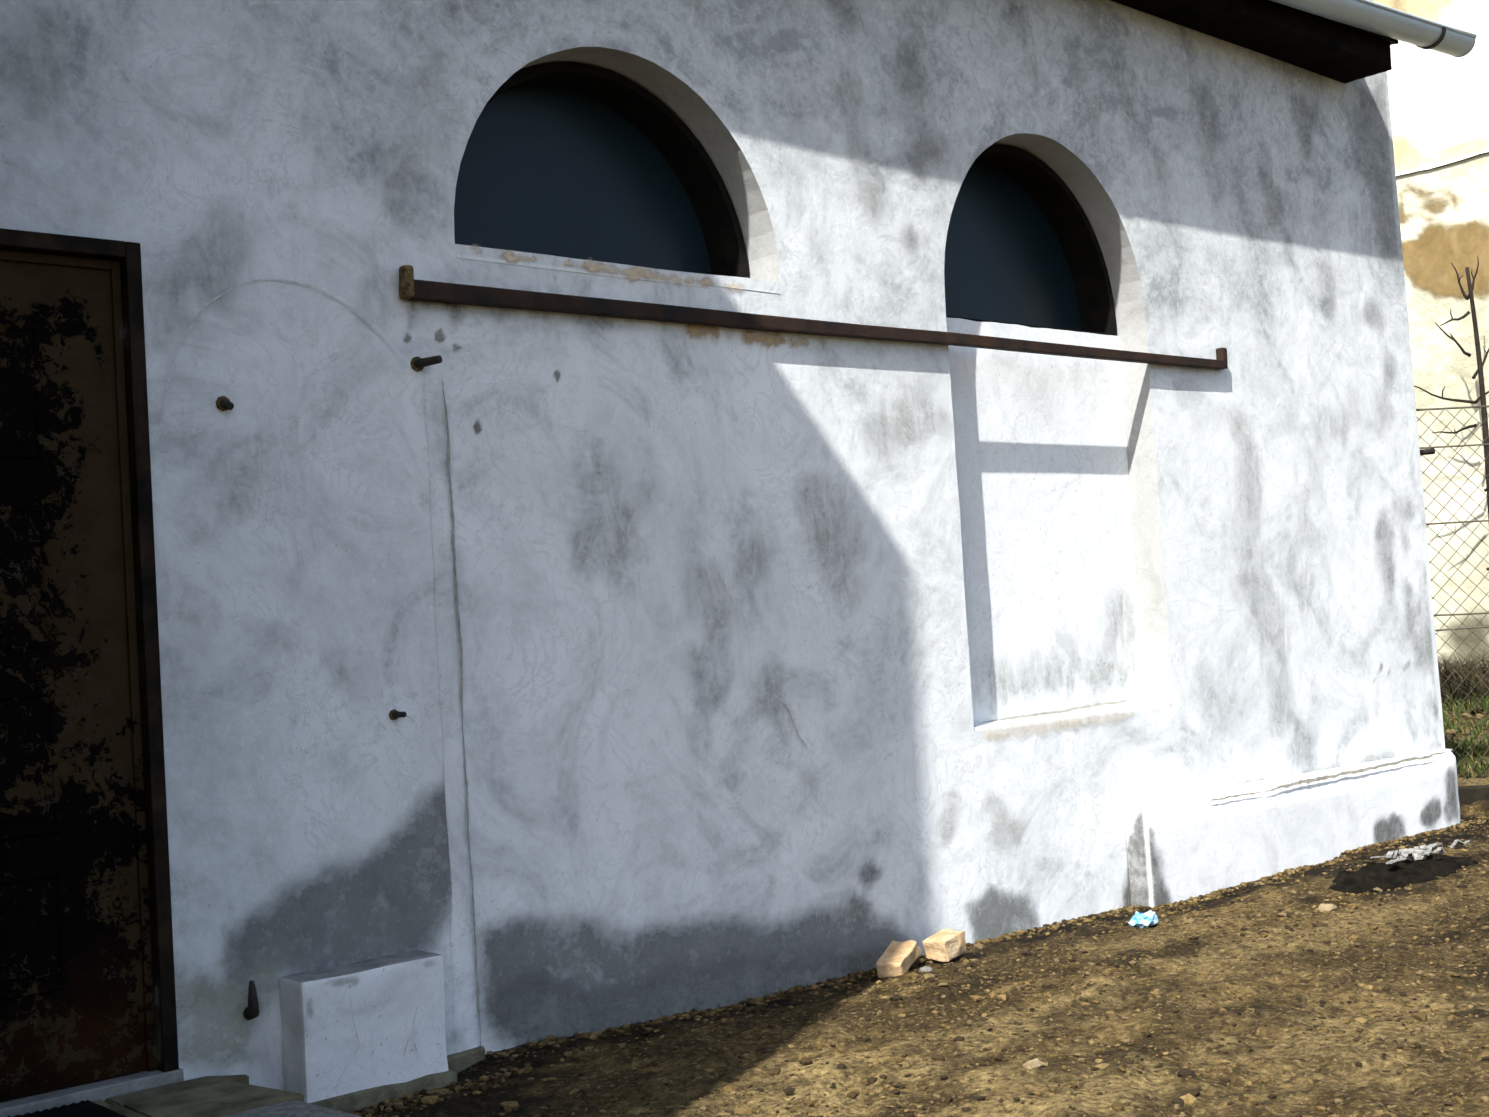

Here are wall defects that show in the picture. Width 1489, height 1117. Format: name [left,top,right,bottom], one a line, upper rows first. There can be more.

flaking render [1387,0,1489,156]
flaking render [1399,188,1489,299]
rust [687,324,719,337]
rust [744,332,806,346]
flaking render [1421,454,1485,479]
damp [1124,811,1170,908]
damp [1374,814,1404,843]
damp [1421,772,1458,825]
damp [176,792,452,1061]
damp [484,899,907,1041]